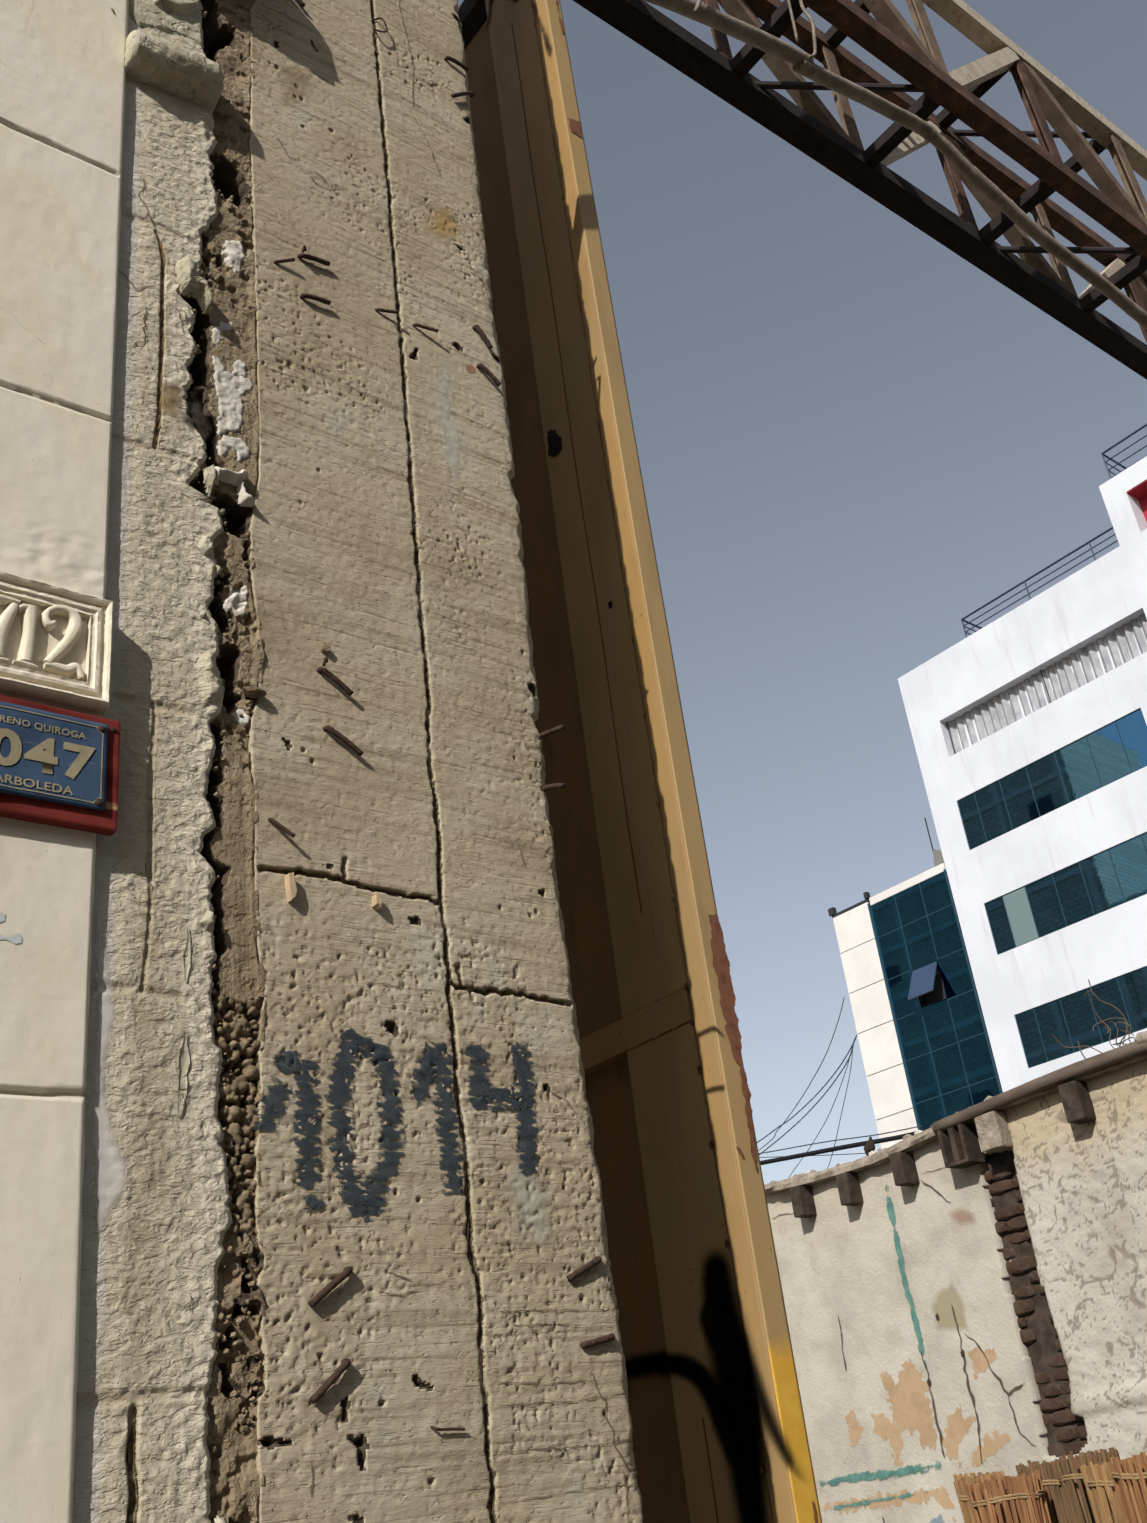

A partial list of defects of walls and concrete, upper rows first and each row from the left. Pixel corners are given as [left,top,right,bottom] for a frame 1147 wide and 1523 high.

hole [200,0,237,62]
hole [209,153,252,208]
crack [261,0,637,1523]
spalling [175,236,269,1426]
flaking render [984,1150,1088,1457]
spalling [257,1436,293,1450]
flaking render [845,1358,1011,1468]
crack [921,1306,1035,1462]
flaking render [968,1347,996,1379]